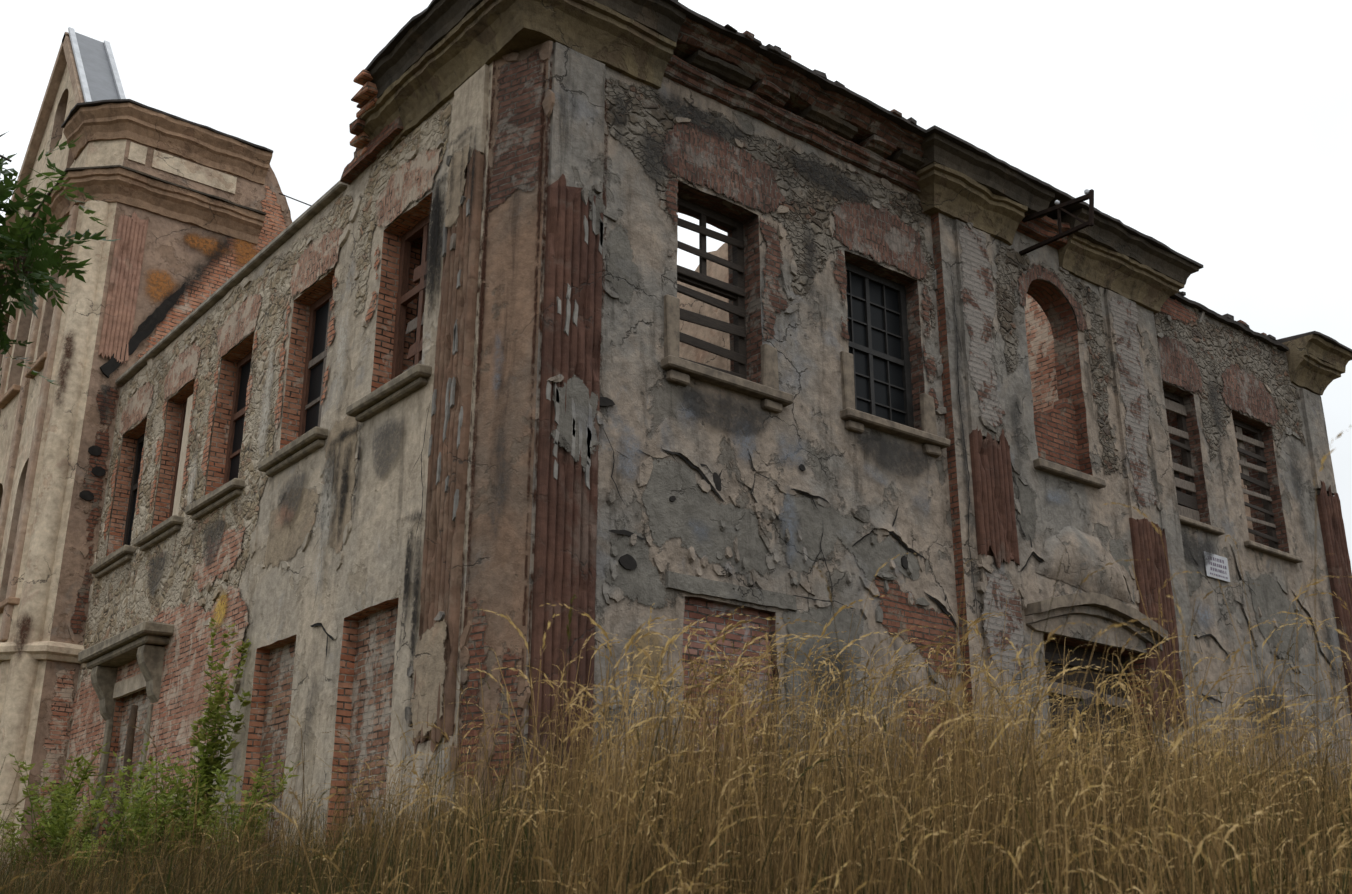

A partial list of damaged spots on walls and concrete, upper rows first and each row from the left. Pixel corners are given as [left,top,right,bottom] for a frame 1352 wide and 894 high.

spalling [487,41,555,211]
peeling [556,283,578,335]
spalling [25,102,470,869]
spalling [546,374,615,490]
crack [603,429,646,540]
spalling [1011,462,1038,542]
spalling [405,598,531,783]